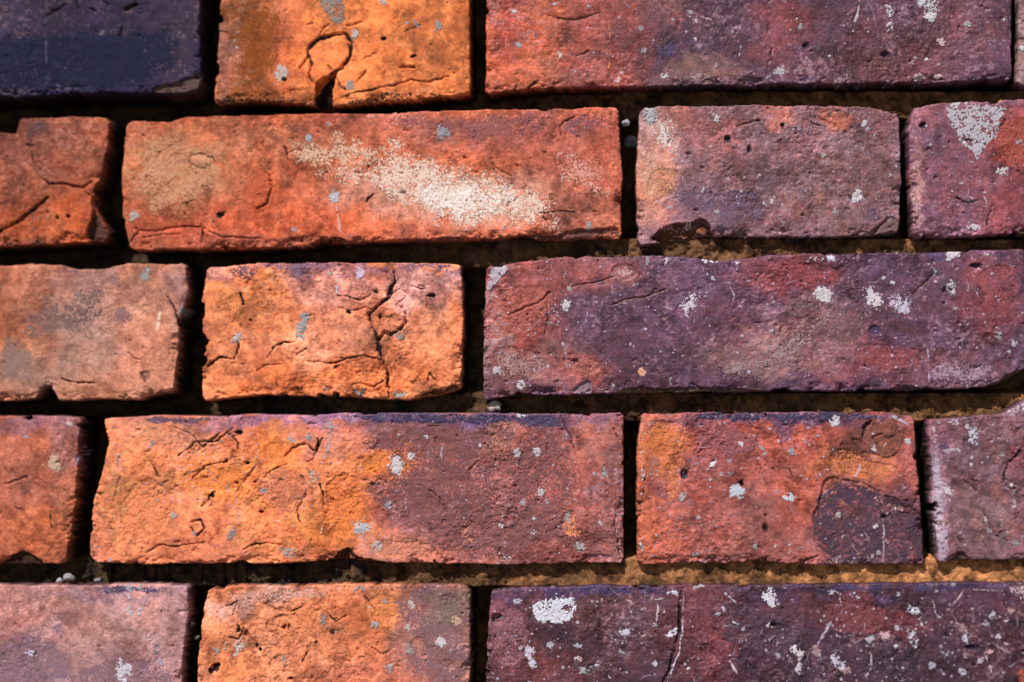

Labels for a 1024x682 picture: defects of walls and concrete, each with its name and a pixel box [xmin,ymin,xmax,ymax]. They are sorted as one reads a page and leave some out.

spalling [314,79,336,114]
crack [0,144,90,233]
leakage [288,131,564,241]
crack [204,341,307,387]
crack [328,271,422,397]
crack [146,432,323,553]
spalling [811,417,923,565]
crack [662,596,681,682]